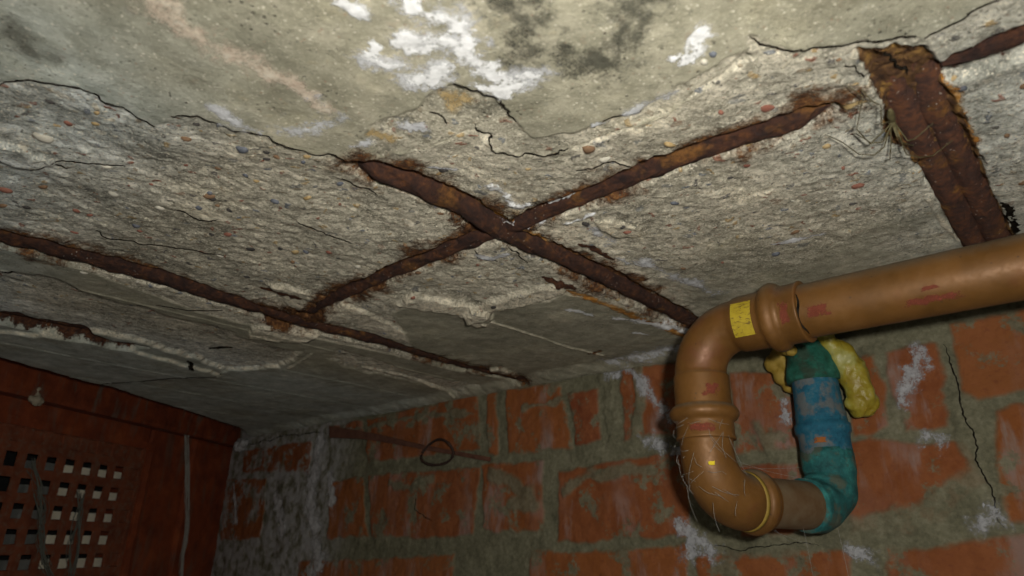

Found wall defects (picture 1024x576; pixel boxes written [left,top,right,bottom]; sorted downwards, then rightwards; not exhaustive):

efflorescence [333,0,370,21]
water stain [354,0,664,111]
efflorescence [667,25,713,66]
crack [750,0,1000,77]
crack [0,79,376,194]
spalling [0,0,1024,385]
crack [453,83,657,172]
corrosion [329,42,1014,337]
corrosion [0,211,479,335]
corrosion [0,312,134,347]
crack [943,344,1004,527]